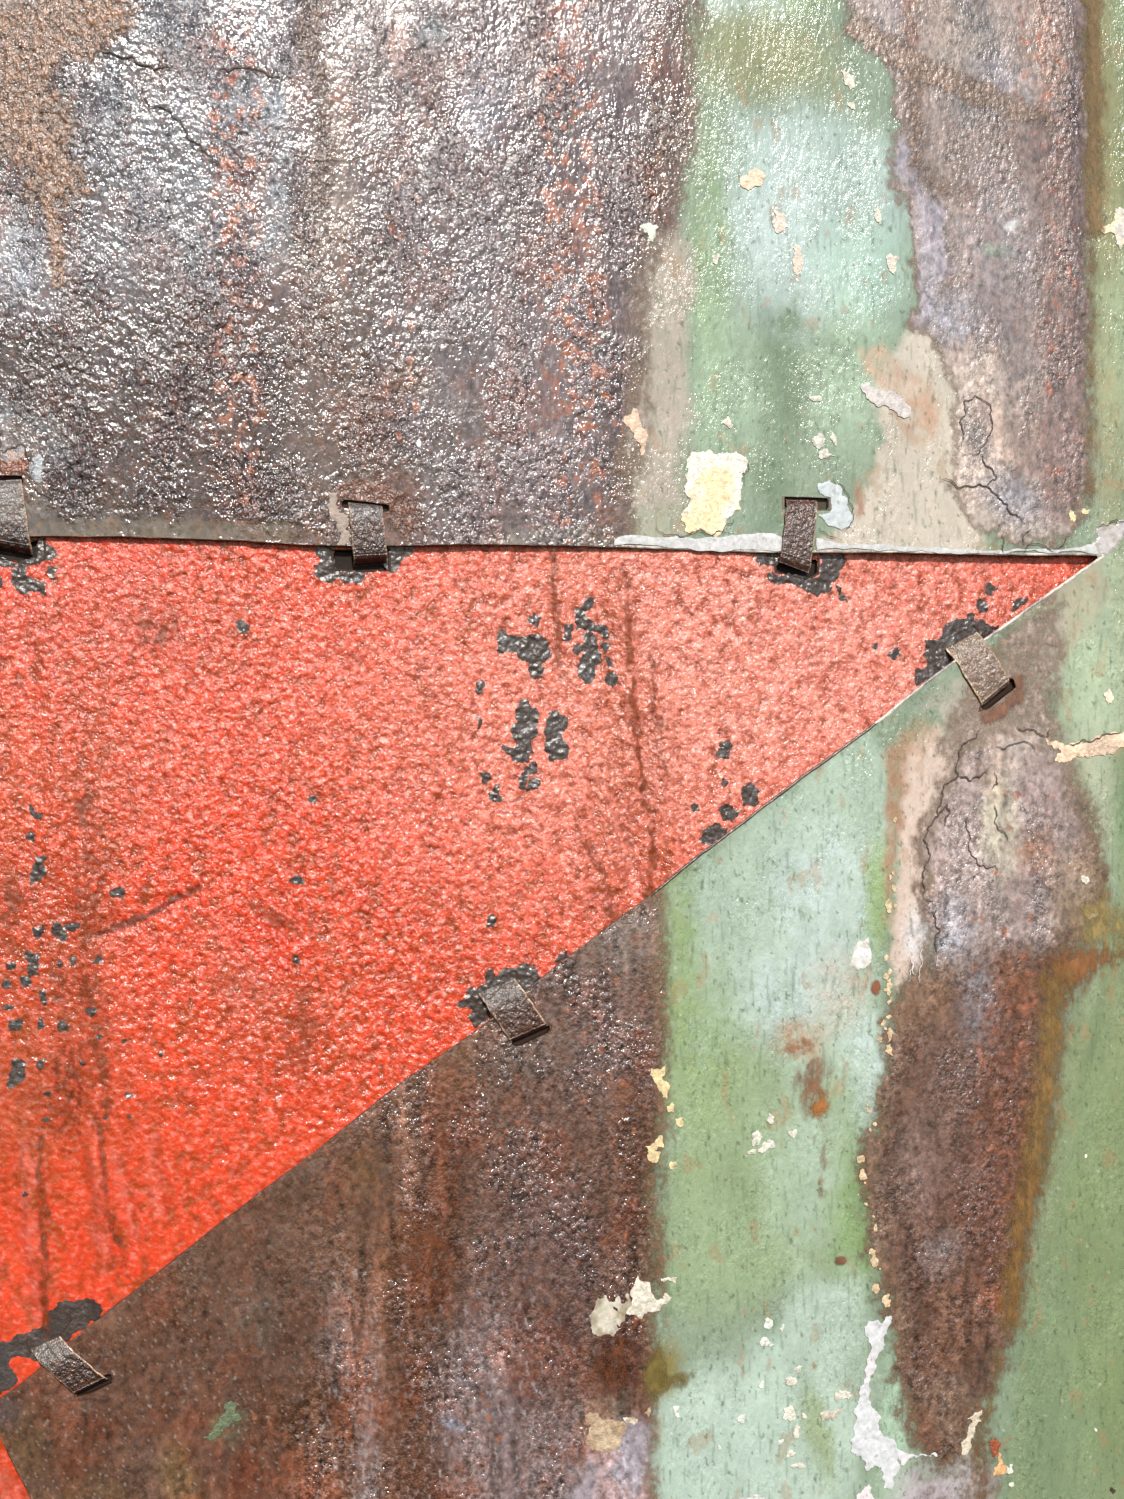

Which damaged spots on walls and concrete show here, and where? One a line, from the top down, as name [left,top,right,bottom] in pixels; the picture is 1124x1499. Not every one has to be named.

corrosion [0,0,705,667]
peeling [614,449,1124,602]
crack [942,395,1124,553]
peeling [496,596,619,688]
peeling [480,699,570,803]
crack [922,727,1121,950]
peeling [1,922,104,1033]
corrosion [0,577,671,1499]
corrosion [835,594,1124,1499]
peeling [0,1298,103,1395]
peeling [589,1275,678,1336]
peeling [778,1155,937,1499]